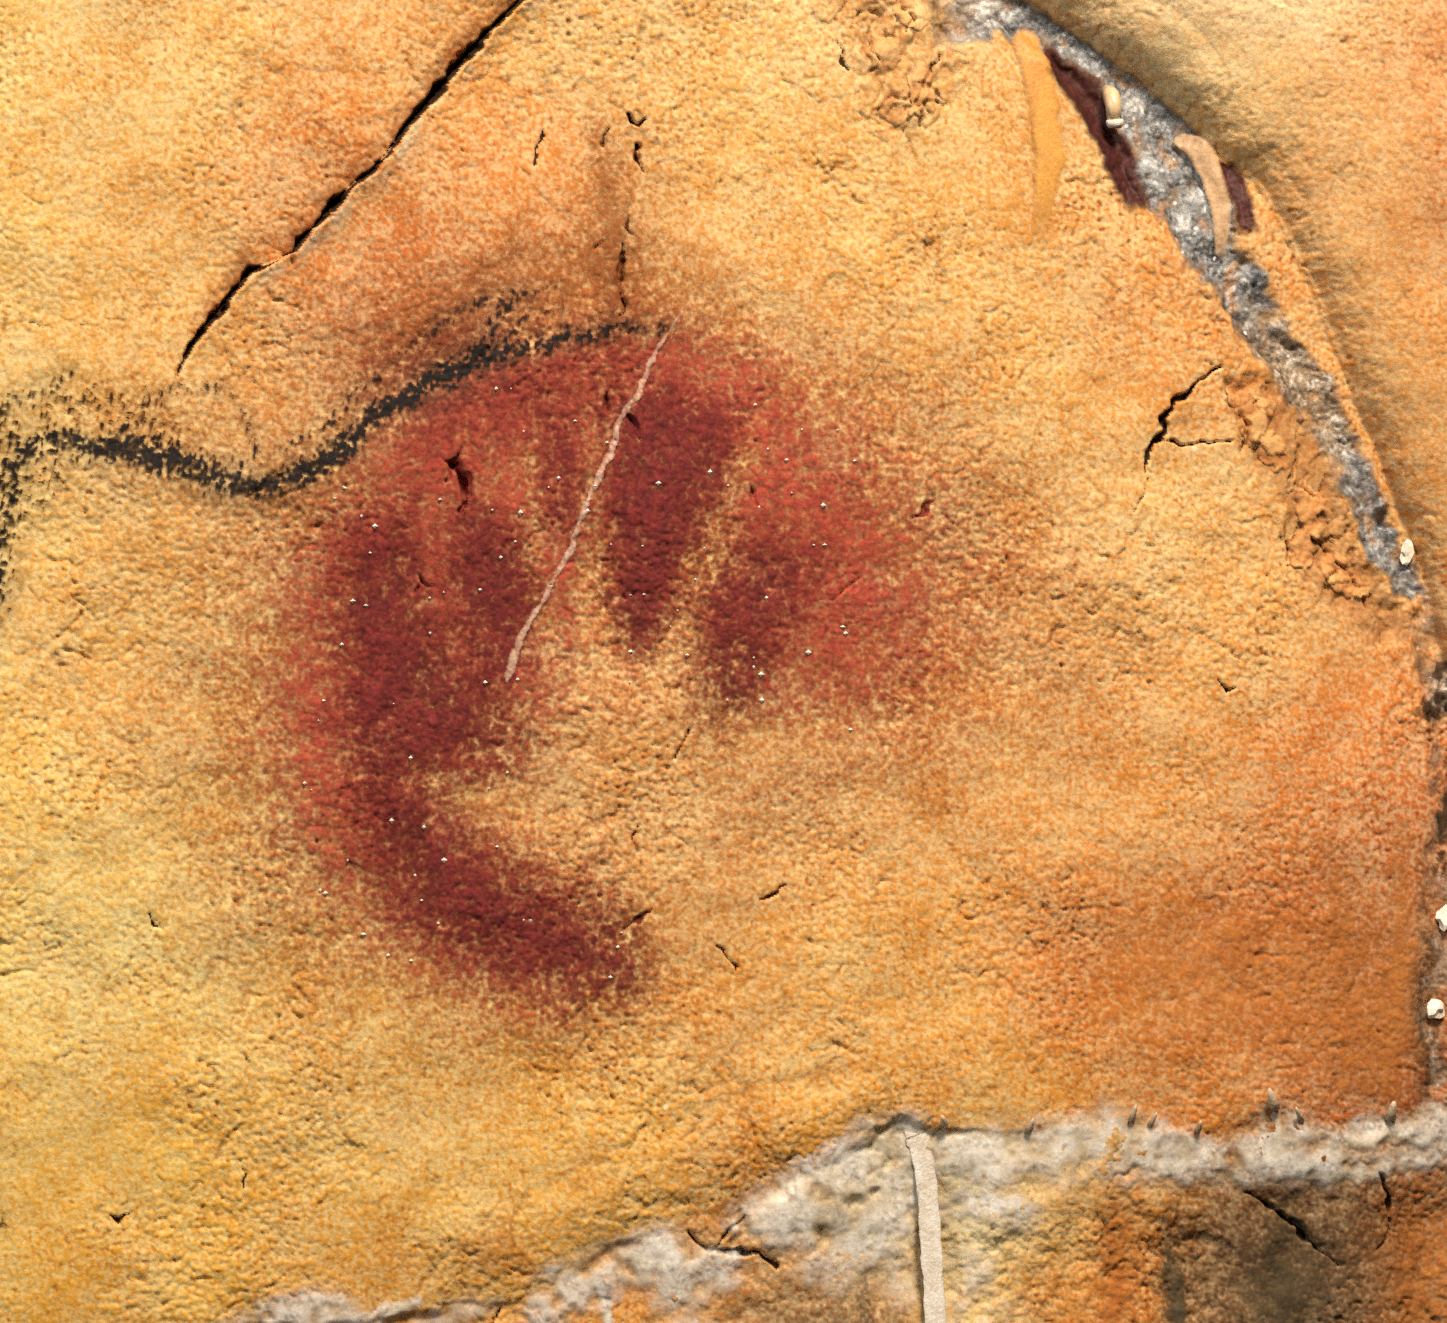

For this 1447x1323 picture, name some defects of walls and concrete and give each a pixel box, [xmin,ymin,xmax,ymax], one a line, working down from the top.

crack [837,42,870,71]
crack [177,0,526,373]
crack [533,131,545,166]
crack [600,113,645,171]
crack [594,218,632,317]
crack [1138,366,1247,504]
water stain [729,1114,922,1287]
water stain [932,1105,1447,1221]
water stain [239,1293,500,1323]
water stain [526,1230,739,1323]
water stain [1164,1242,1187,1323]
water stain [1203,1204,1377,1323]